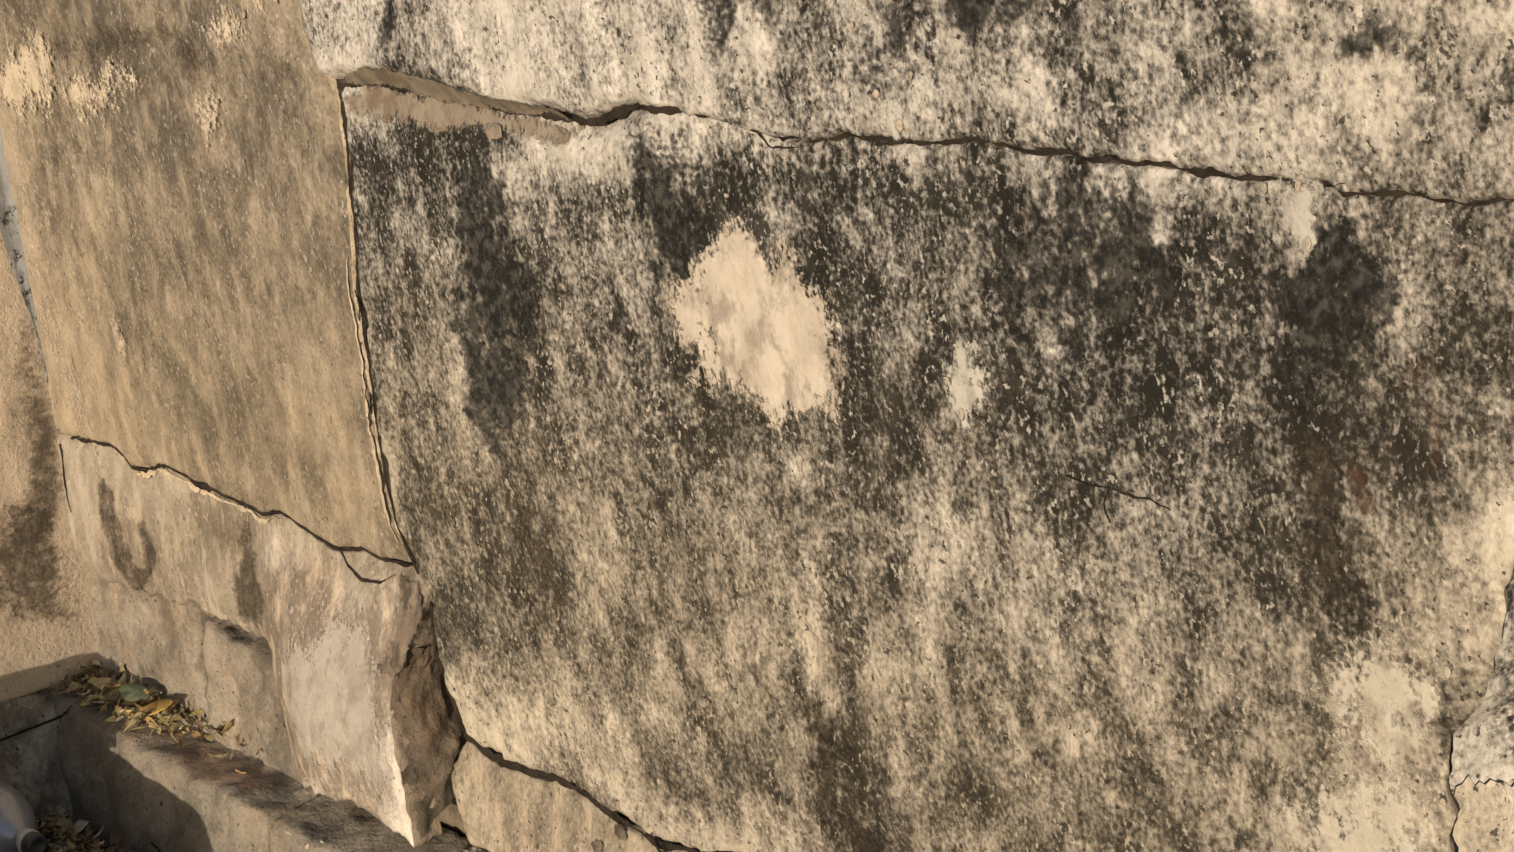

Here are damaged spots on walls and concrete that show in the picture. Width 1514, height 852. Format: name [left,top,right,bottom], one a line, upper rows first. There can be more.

water stain [110,315,127,360]
water stain [449,157,540,458]
water stain [630,120,705,292]
crack [59,79,1514,584]
water stain [989,159,1179,368]
water stain [1268,220,1400,412]
water stain [0,301,90,622]
water stain [1275,420,1372,621]
crack [0,705,74,742]
crack [429,601,733,852]
water stain [804,702,881,852]